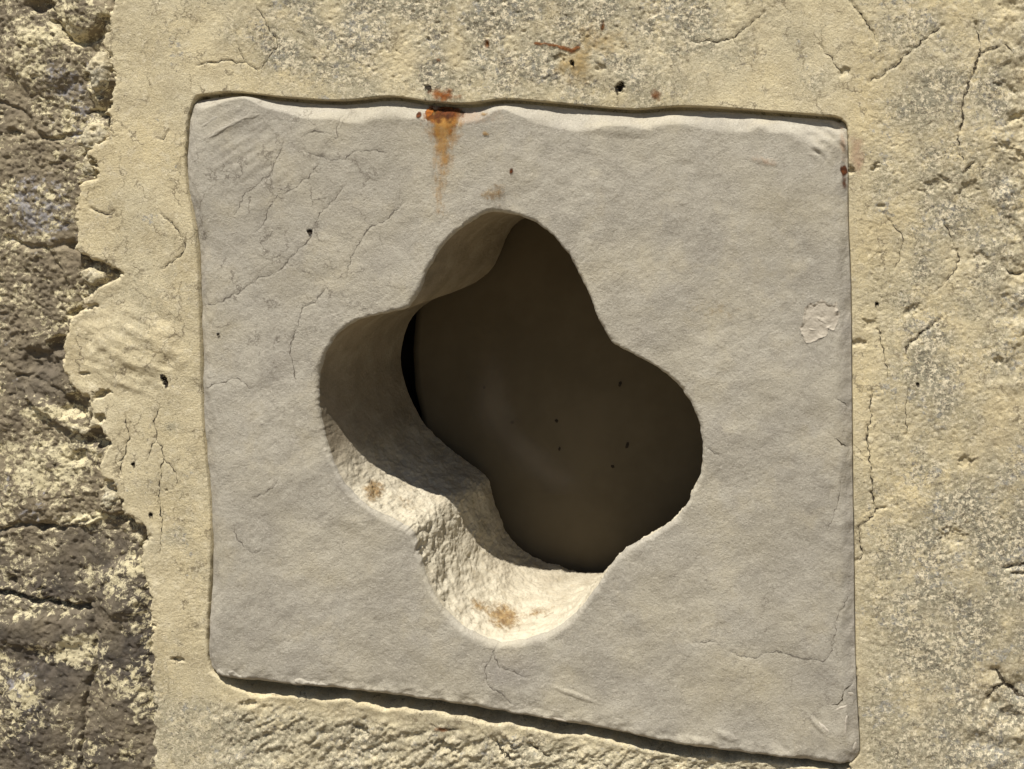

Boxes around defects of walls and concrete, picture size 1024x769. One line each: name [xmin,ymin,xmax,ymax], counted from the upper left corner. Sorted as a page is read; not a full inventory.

crack [871,25,944,80]
corrosion [416,89,460,164]
crack [957,23,1013,172]
crack [236,119,386,231]
crack [208,187,343,305]
crack [346,204,402,278]
peeling [799,299,840,343]
crack [879,318,940,432]
crack [694,597,848,662]
crack [484,646,525,705]